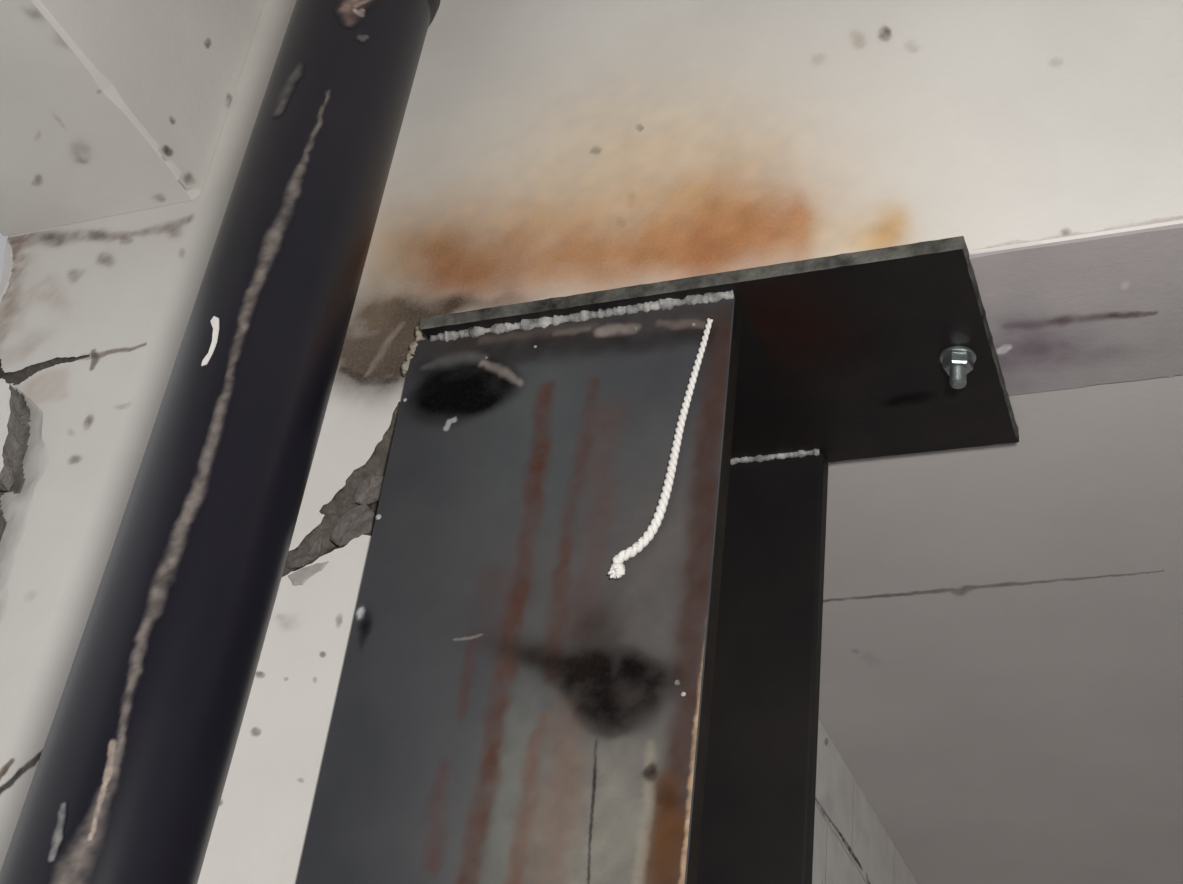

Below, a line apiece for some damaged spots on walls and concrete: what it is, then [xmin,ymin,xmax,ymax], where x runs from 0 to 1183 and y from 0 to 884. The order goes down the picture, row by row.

corrosion [371,0,1062,297]
flaking render [0,378,22,491]
crack [0,341,148,622]
crack [282,402,401,586]
corrosion [511,378,560,584]
corrosion [568,388,640,577]
corrosion [663,331,731,680]
crack [823,570,1165,603]
crack [0,745,44,798]
corrosion [448,669,521,884]
corrosion [637,700,695,884]
crack [830,821,871,884]